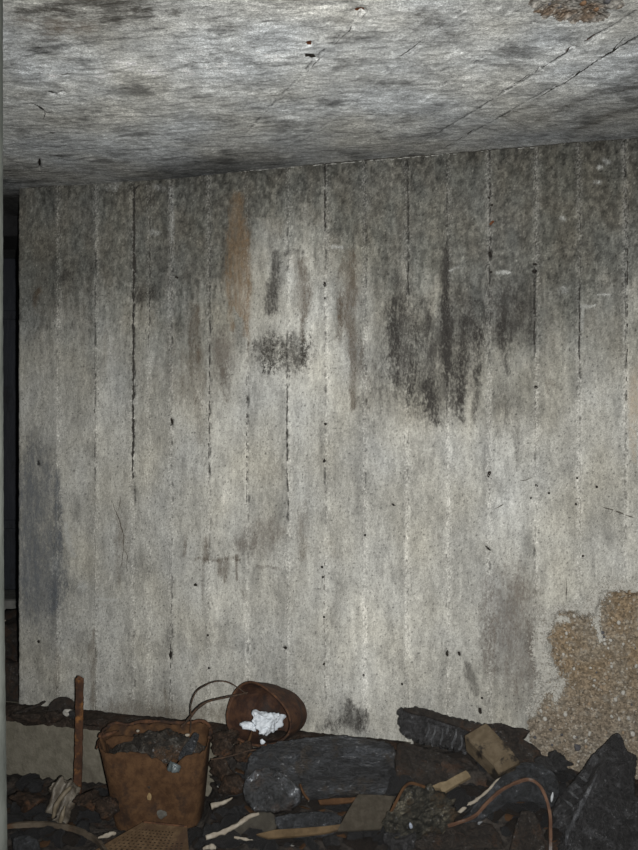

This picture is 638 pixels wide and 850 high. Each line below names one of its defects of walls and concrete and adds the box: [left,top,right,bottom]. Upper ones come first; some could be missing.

spalling [528,0,626,24]
crack [478,31,601,118]
crack [535,35,638,100]
leakage [441,248,466,421]
spalling [523,575,638,779]